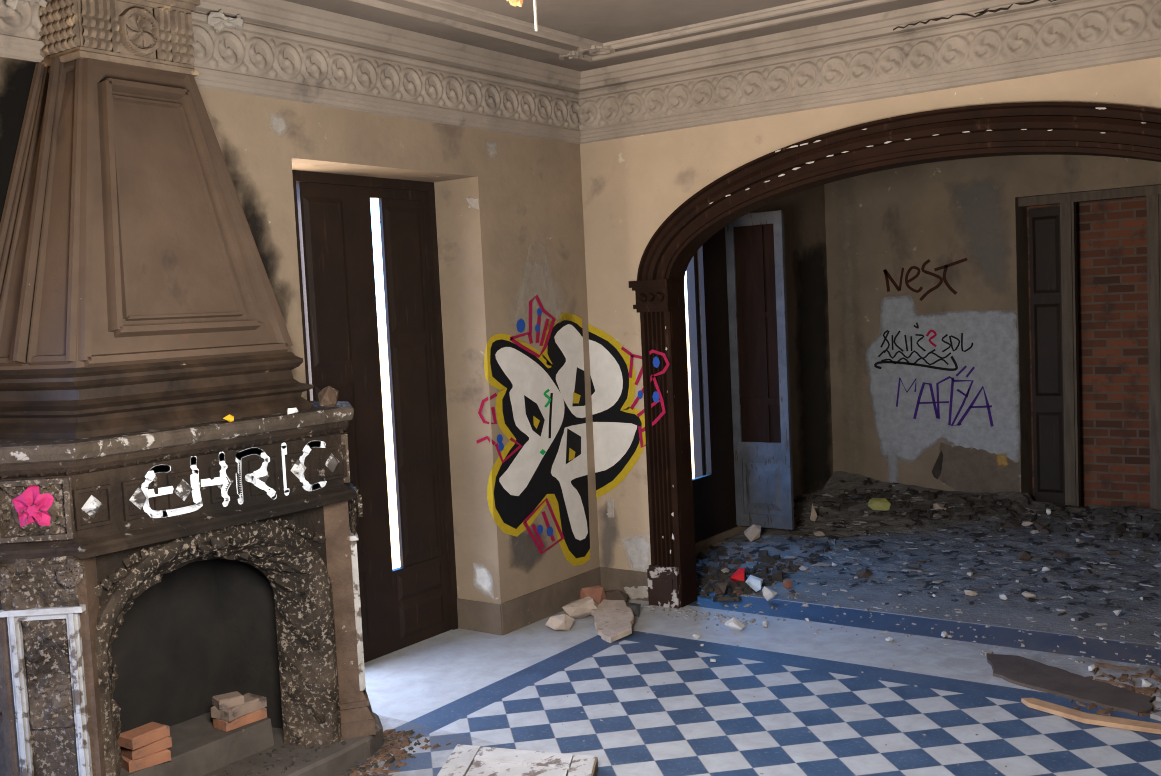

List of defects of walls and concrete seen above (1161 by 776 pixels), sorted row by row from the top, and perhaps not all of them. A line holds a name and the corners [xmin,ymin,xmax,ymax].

crack [893,0,1057,31]
spalling [938,443,1021,493]